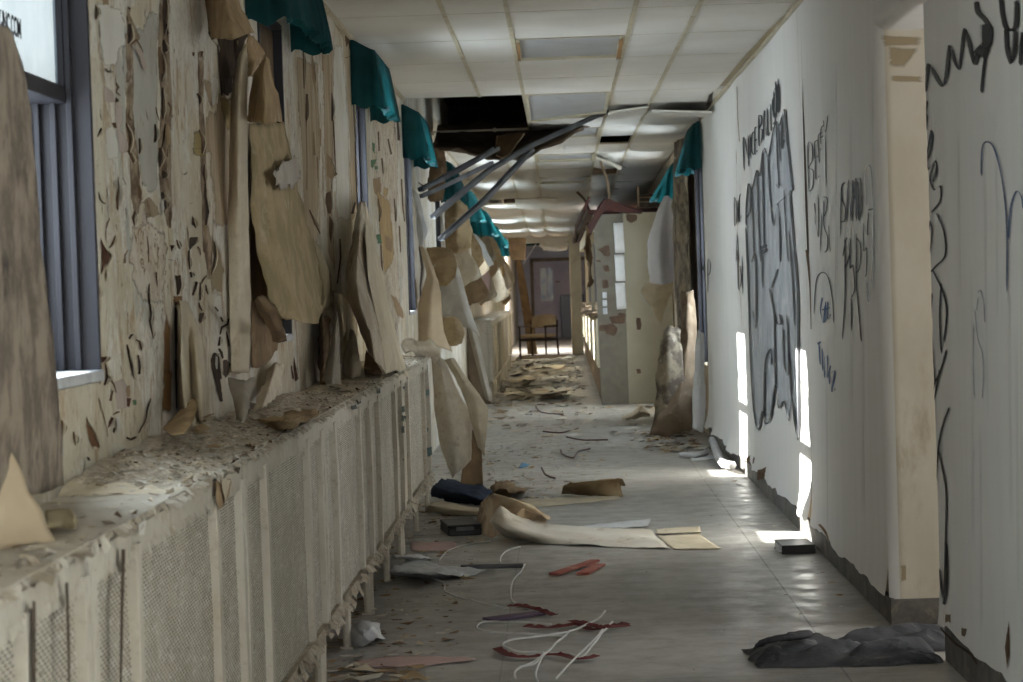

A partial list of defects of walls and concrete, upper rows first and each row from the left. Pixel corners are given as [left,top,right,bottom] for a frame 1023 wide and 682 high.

flaking render [98,0,248,402]
flaking render [296,24,358,271]
flaking render [373,120,404,332]
peeling [596,245,610,288]
peeling [599,313,642,336]